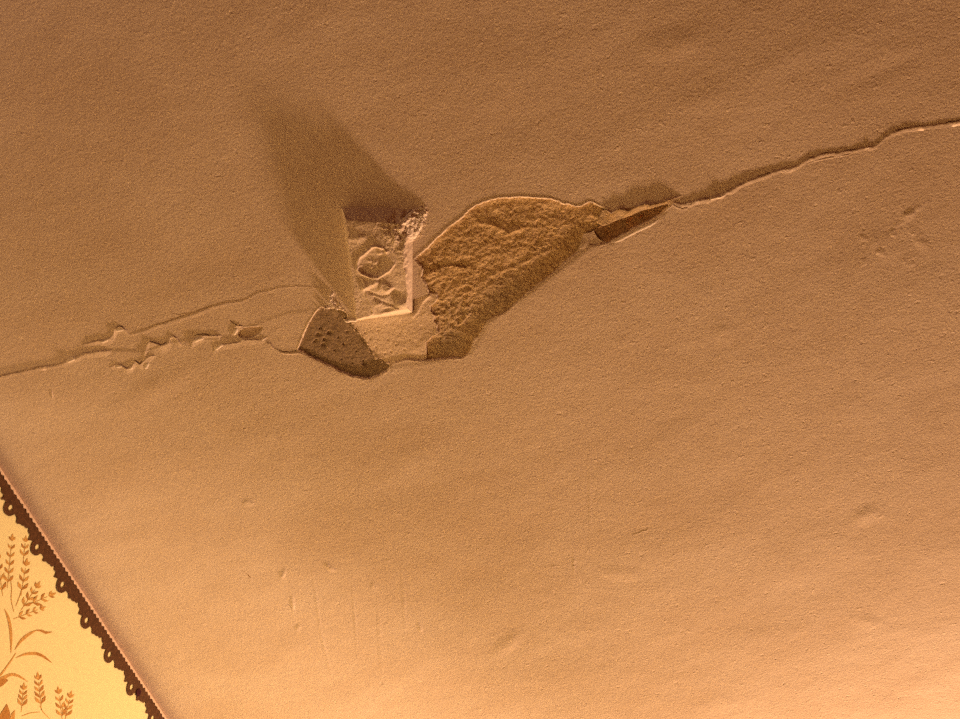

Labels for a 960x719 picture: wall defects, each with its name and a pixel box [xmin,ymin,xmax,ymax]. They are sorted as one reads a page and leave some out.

crack [594,119,960,247]
crack [129,285,332,336]
flaking render [296,195,681,381]